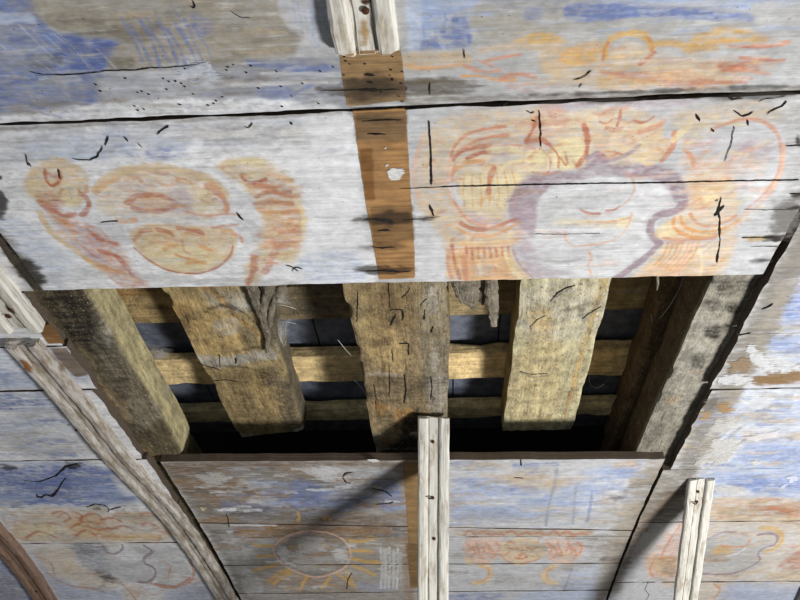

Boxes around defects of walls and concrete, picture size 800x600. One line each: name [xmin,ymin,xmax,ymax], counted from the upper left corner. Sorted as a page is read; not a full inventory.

crack [58,136,143,179]
crack [696,96,787,160]
peeling [361,149,414,243]
crack [364,121,800,262]
crack [30,463,78,498]